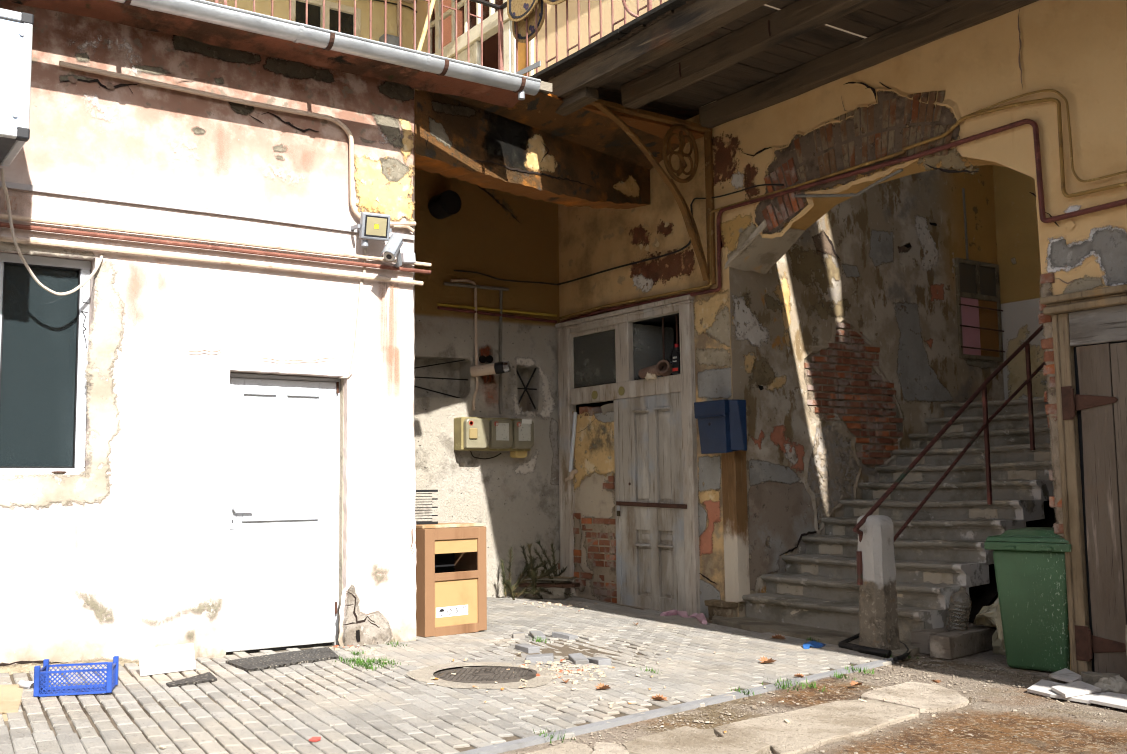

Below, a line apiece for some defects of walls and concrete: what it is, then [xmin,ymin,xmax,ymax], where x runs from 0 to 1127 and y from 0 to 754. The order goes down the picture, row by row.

crack [62,75,137,93]
flaking render [172,35,335,83]
crack [251,112,319,132]
peeling [354,112,415,229]
peeling [524,134,558,173]
flaking render [712,87,979,260]
flaking render [694,229,906,535]
peeling [1006,206,1127,538]
flaking render [558,411,617,603]
leakage [76,591,114,623]
leakage [145,598,222,624]
flaking render [338,583,395,647]